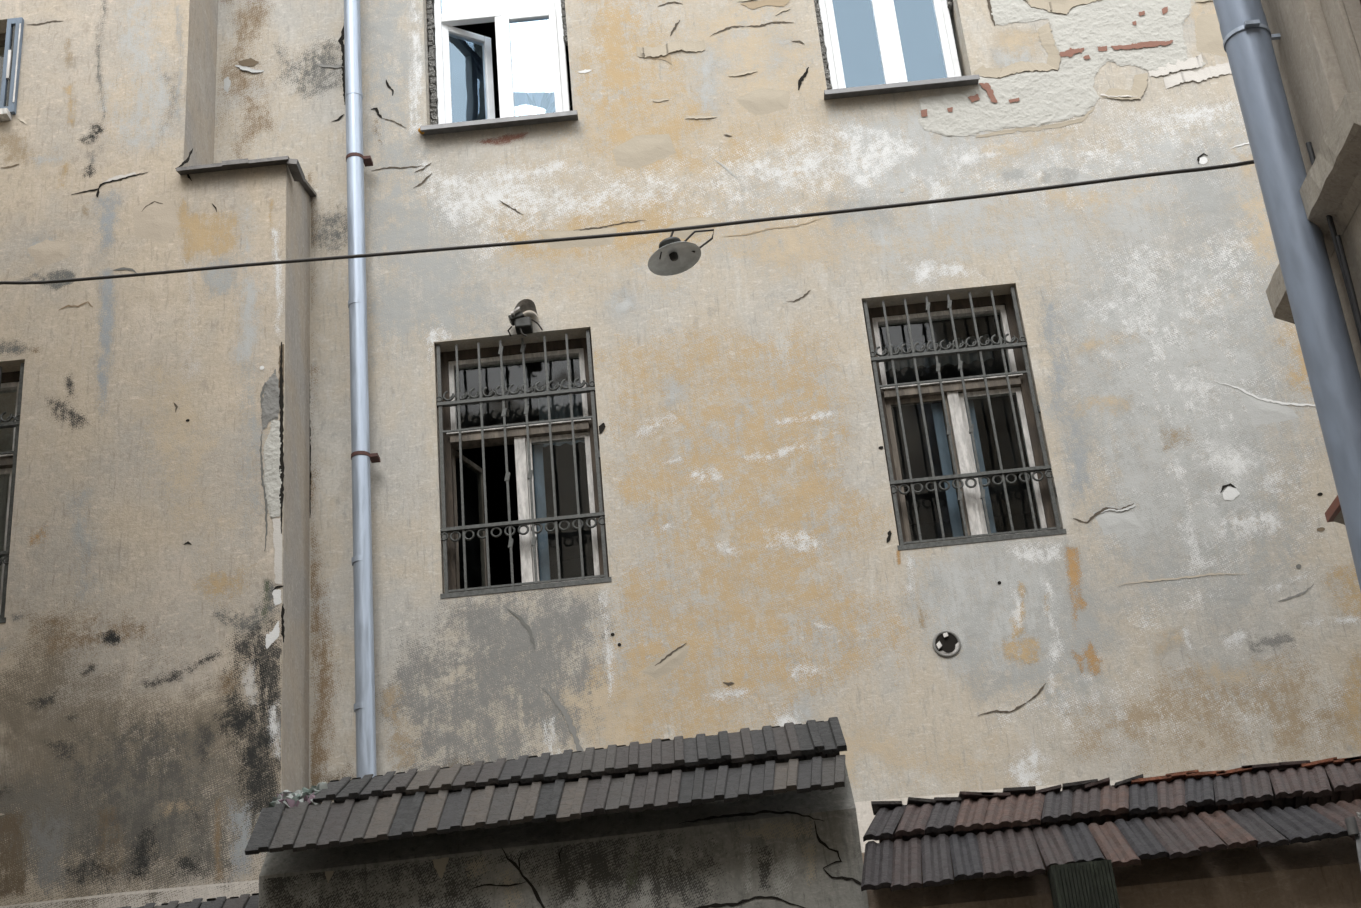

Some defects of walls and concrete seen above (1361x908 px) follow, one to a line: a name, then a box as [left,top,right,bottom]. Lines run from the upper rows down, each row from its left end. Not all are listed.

damp [0,0,186,178]
damp [216,0,343,160]
crack [334,26,406,128]
flaking render [636,40,705,64]
flaking render [737,0,790,15]
flaking render [918,0,1232,138]
crack [71,149,217,212]
damp [360,0,1361,798]
flaking render [260,344,284,649]
damp [0,183,819,908]
crack [978,683,1046,716]
crack [696,896,805,908]